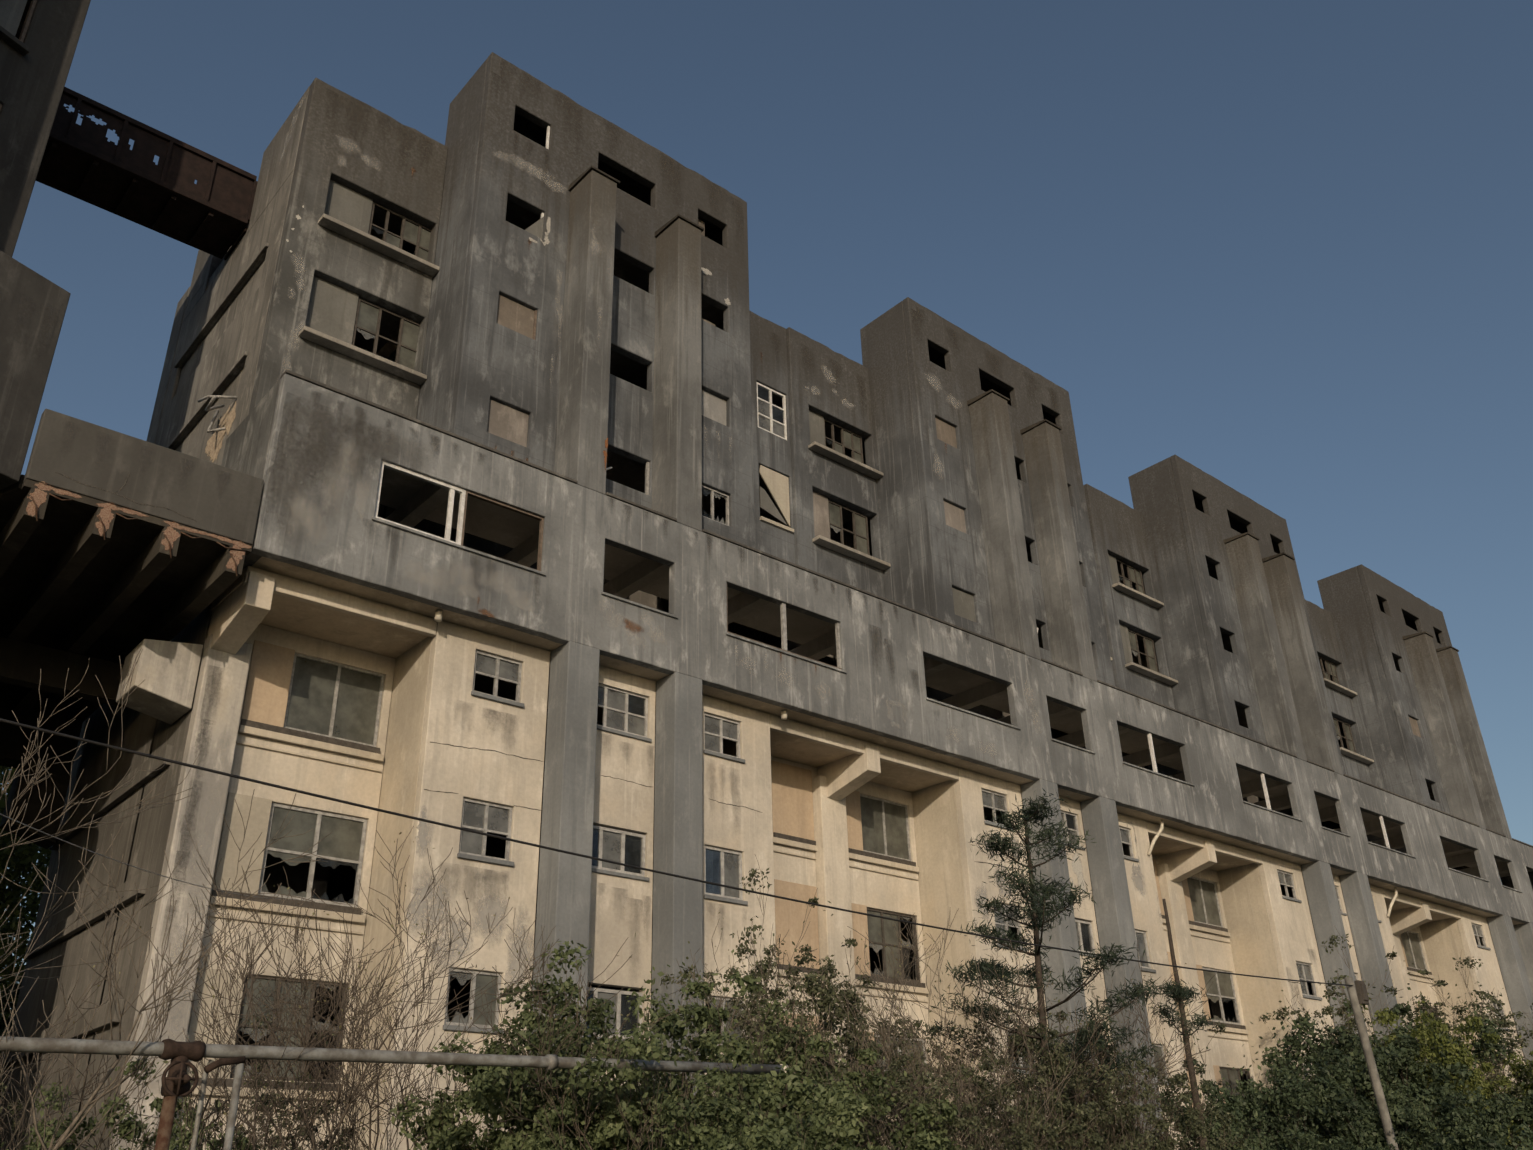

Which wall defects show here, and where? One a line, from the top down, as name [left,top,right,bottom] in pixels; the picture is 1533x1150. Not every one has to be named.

spalling [26,481,252,571]